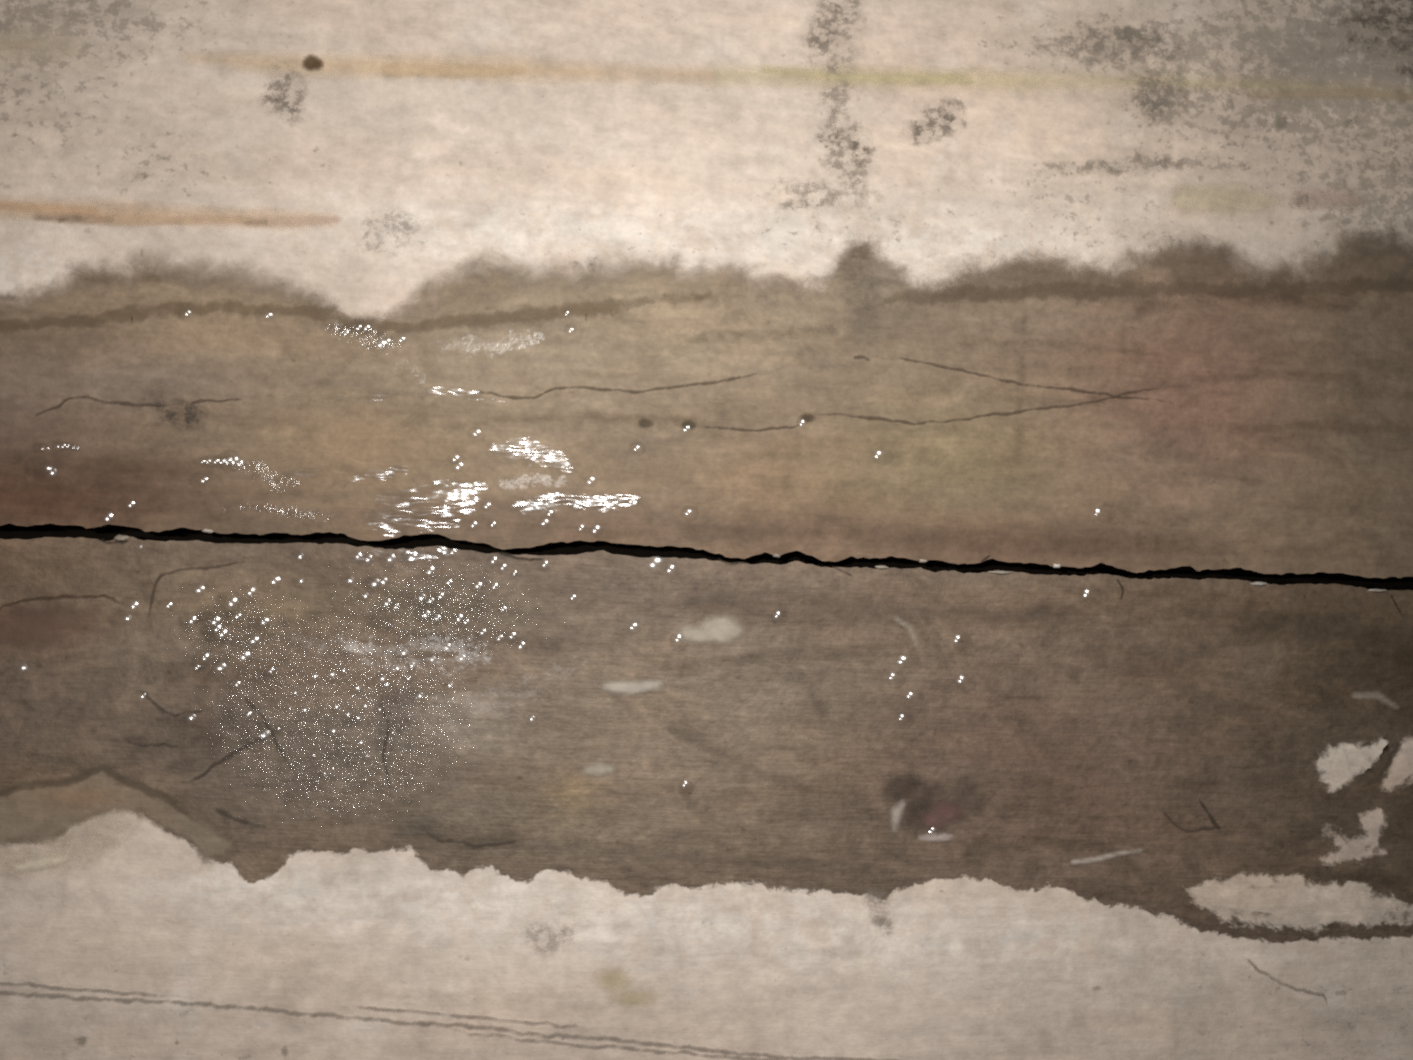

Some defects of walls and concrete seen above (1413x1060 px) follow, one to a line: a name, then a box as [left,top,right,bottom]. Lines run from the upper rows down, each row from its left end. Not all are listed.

leakage [811,0,859,52]
leakage [828,68,870,186]
crack [0,523,1413,612]
leakage [0,233,1413,943]